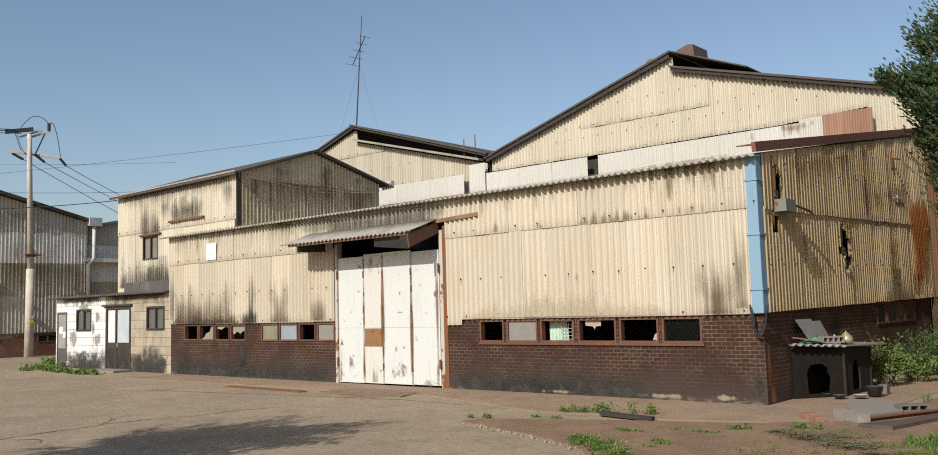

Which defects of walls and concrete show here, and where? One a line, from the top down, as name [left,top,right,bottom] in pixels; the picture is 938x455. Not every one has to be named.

rust [910,202,928,291]